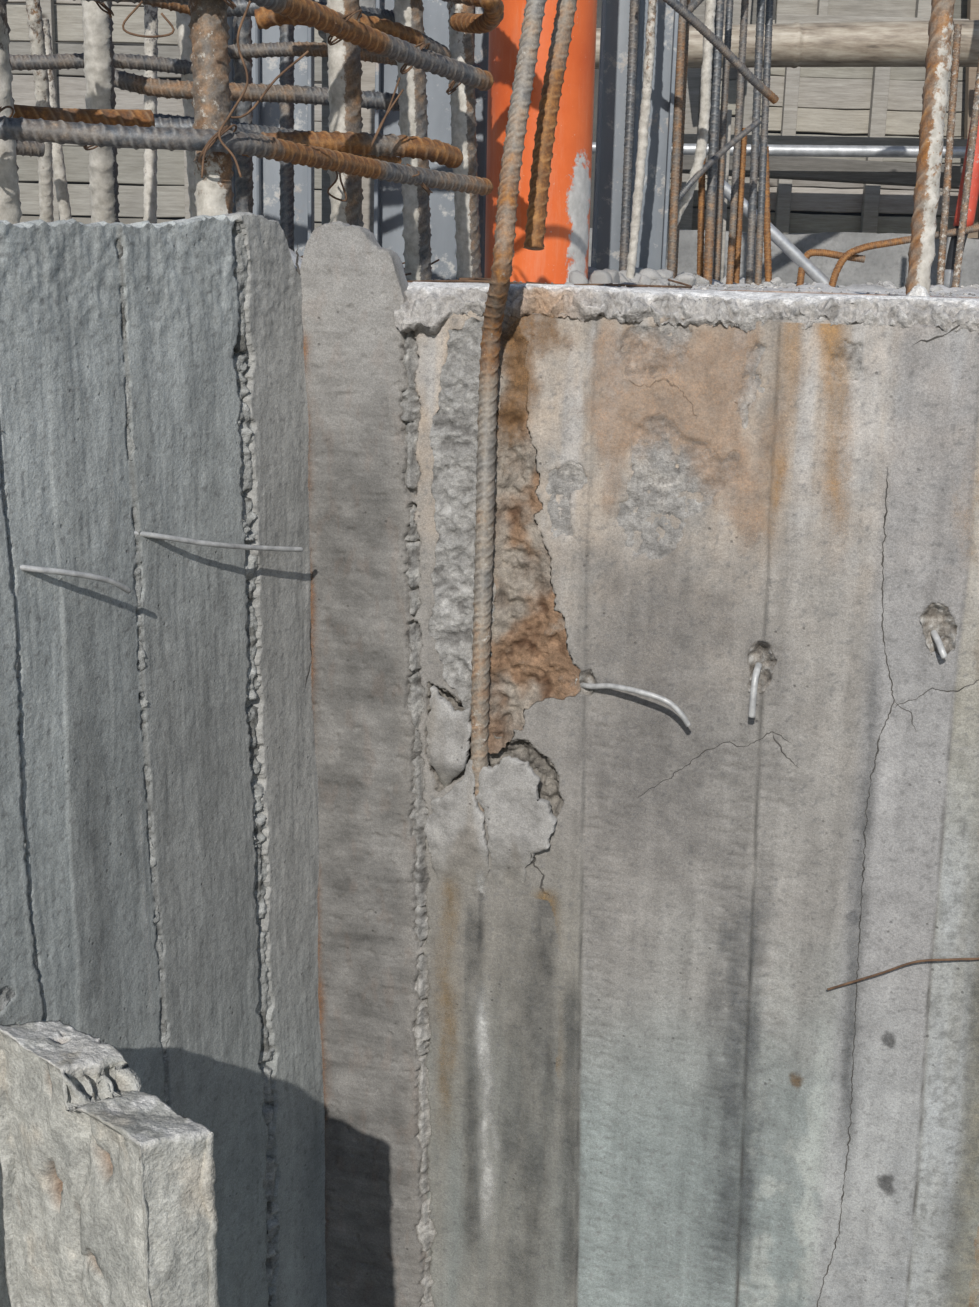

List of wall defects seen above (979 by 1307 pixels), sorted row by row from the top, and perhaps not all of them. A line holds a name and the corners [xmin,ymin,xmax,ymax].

spalling [394,282,489,336]
rust [504,314,557,438]
spalling [424,284,979,892]
crack [639,731,799,797]
crack [817,467,978,1307]
damp [468,1002,493,1232]